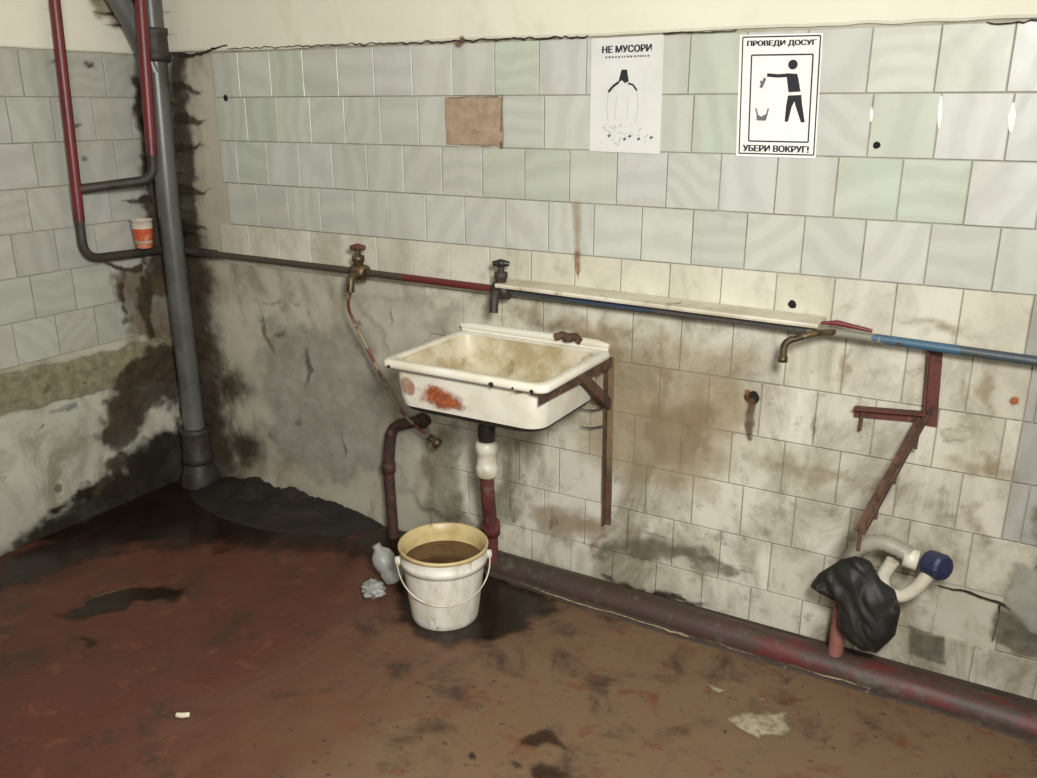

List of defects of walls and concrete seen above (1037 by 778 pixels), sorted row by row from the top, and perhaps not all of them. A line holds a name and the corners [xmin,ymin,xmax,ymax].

water stain [92,0,121,27]
peeling [445,95,504,149]
water stain [0,52,407,585]
peeling [0,335,174,415]
peeling [355,295,455,492]
water stain [628,538,714,560]
water stain [397,570,558,644]
water stain [602,574,700,605]
crack [938,585,1012,641]